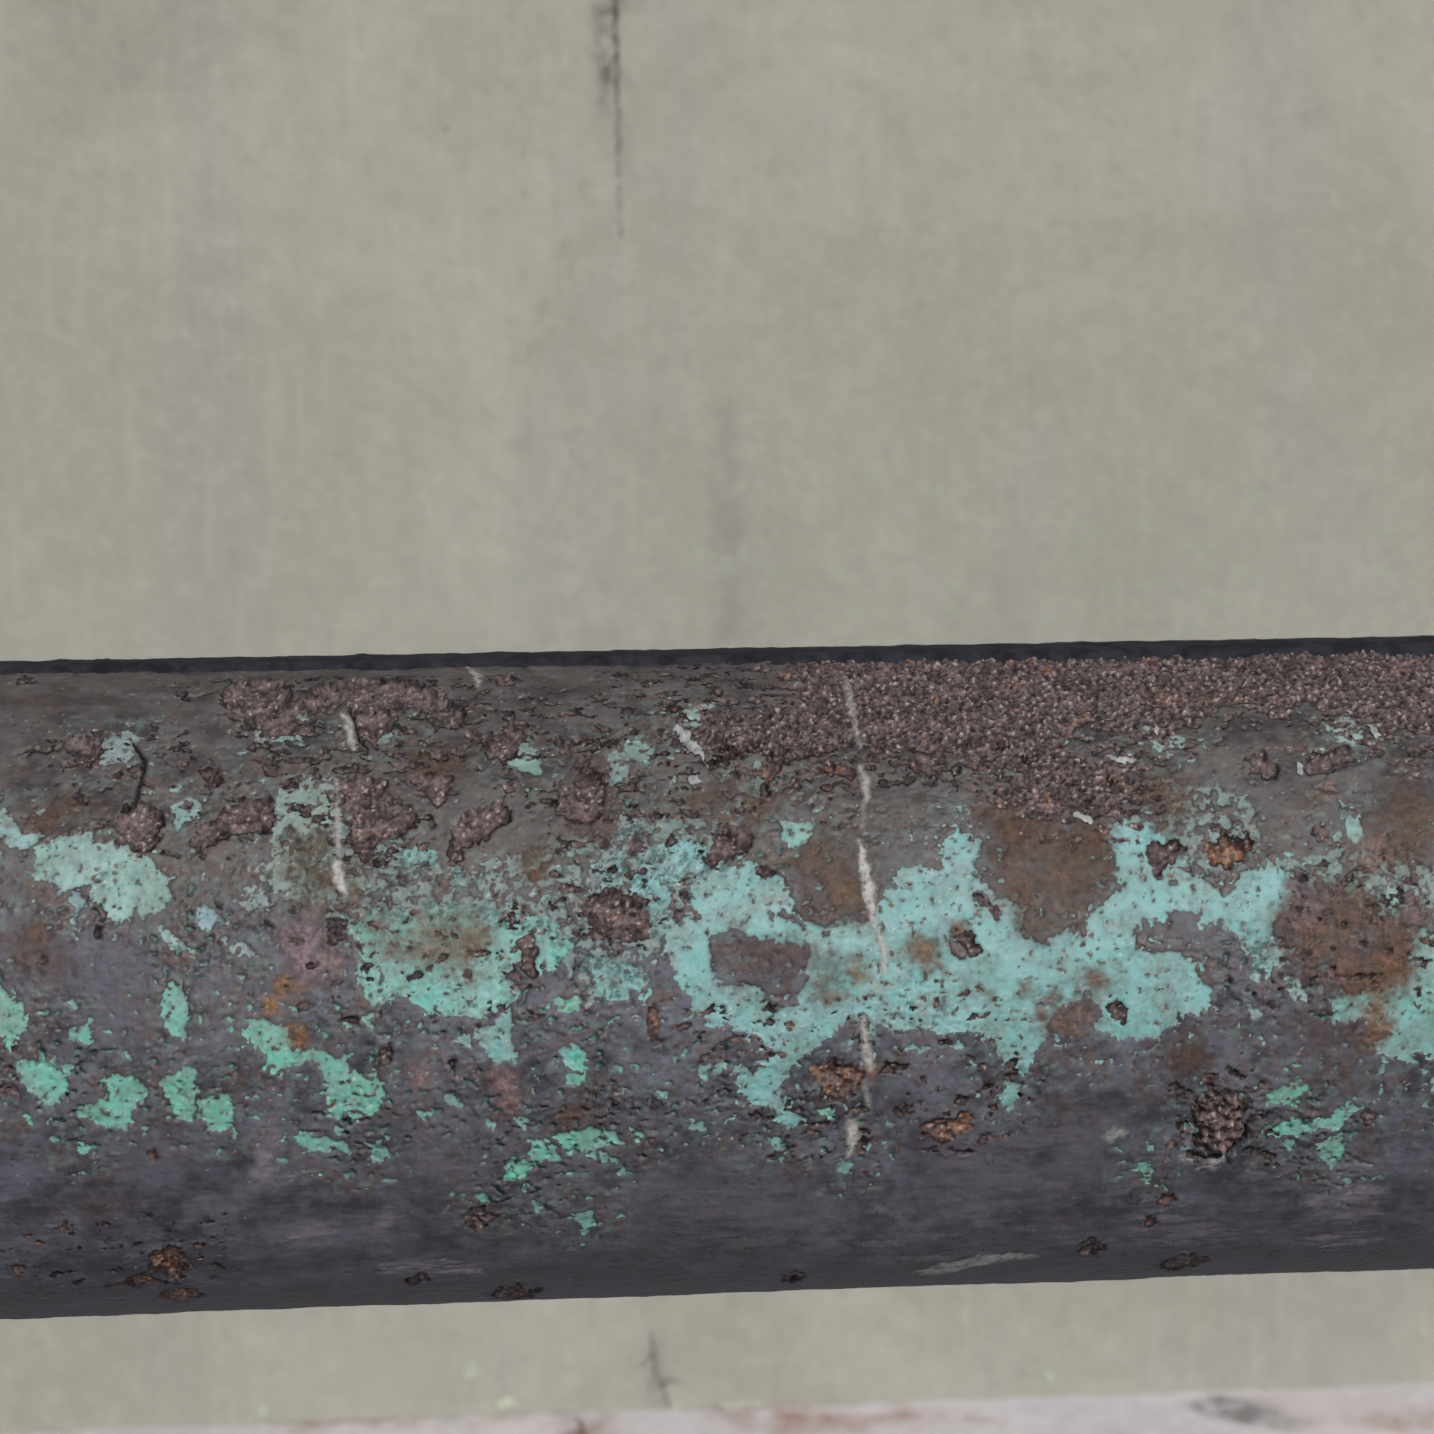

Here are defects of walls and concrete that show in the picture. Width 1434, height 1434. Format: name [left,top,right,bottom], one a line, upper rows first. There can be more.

crack [595,0,623,237]
rust [46,721,273,860]
rust [211,662,1158,1024]
rust [1274,840,1434,1039]
rust [487,1071,520,1114]
rust [671,951,1108,1161]
rust [1165,1065,1280,1170]
rust [0,1211,85,1285]
rust [94,1213,229,1284]